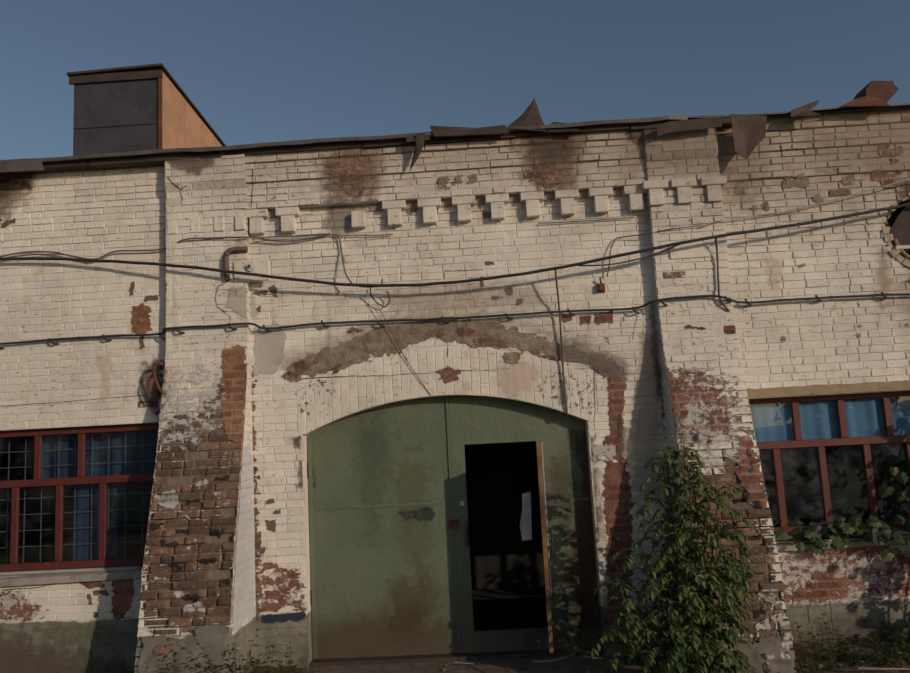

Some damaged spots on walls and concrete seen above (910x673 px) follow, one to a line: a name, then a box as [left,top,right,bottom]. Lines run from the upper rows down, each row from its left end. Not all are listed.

leakage [324,148,380,210]
leakage [514,134,586,190]
flaking render [129,281,167,349]
flaking render [562,311,625,325]
rust [144,360,166,417]
flaking render [80,344,307,656]
spalling [282,316,635,627]
flaking render [0,590,49,626]